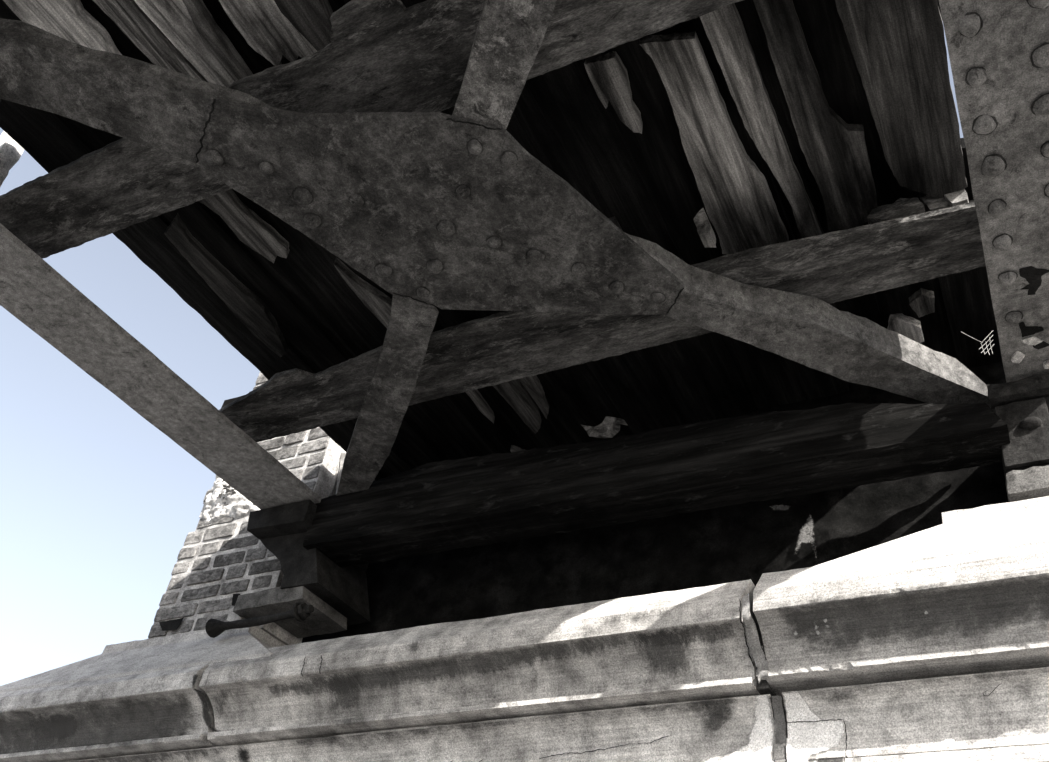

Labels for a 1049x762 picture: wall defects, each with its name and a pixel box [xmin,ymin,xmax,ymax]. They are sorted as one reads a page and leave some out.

damp [640,632,690,674]
damp [330,677,357,710]
crack [739,594,848,762]